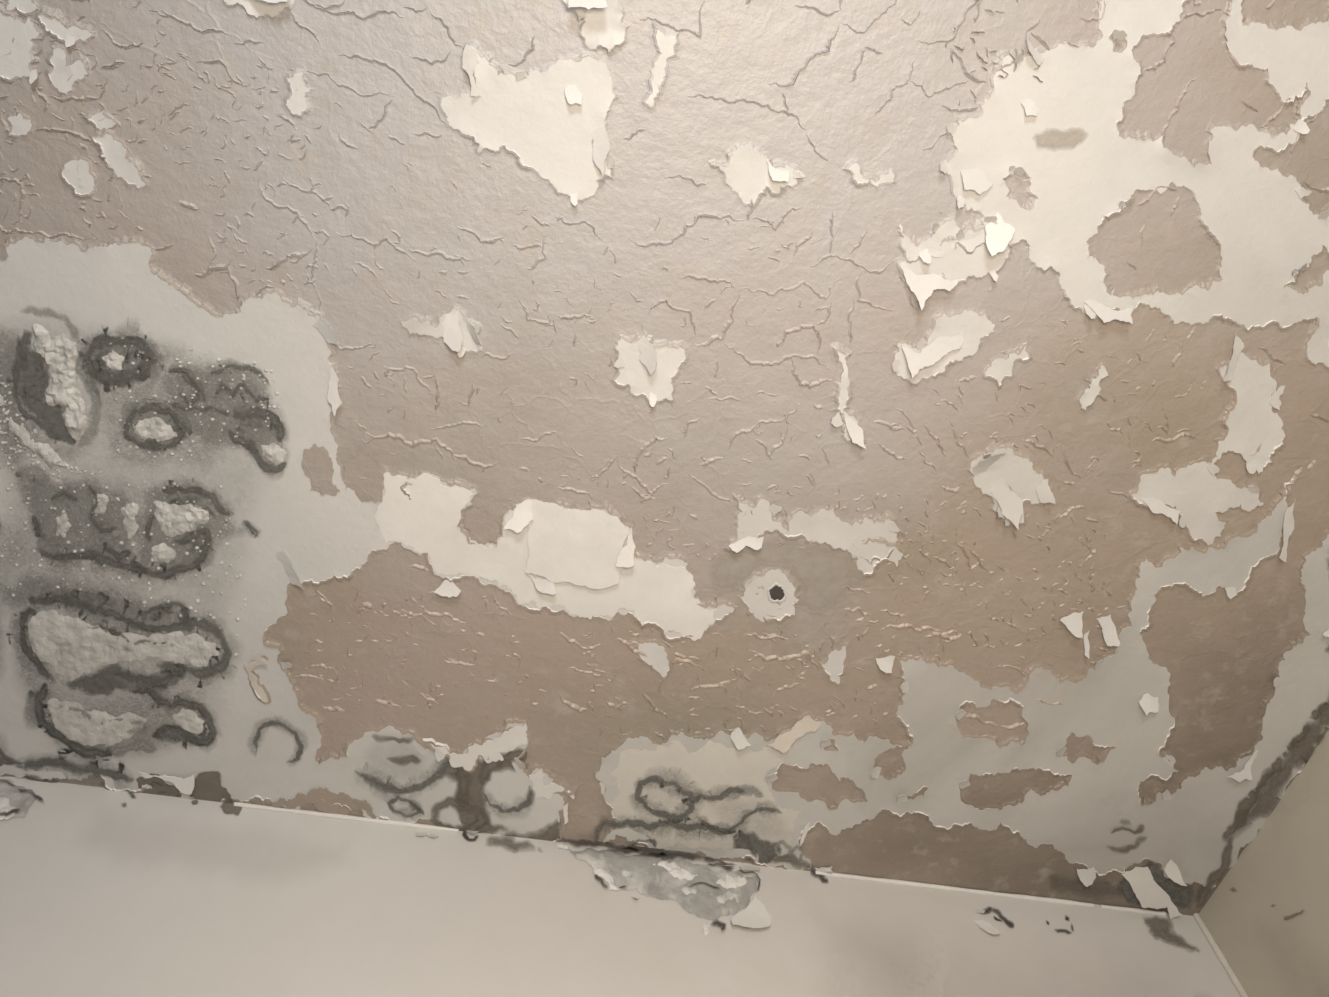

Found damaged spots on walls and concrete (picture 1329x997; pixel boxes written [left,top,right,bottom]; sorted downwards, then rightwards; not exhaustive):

peeling [0,0,98,98]
peeling [436,0,631,207]
peeling [894,0,1329,373]
water stain [0,308,230,579]
water stain [0,578,242,815]
water stain [361,749,560,850]
crack [0,0,1206,741]
peeling [0,233,1329,936]
water stain [595,776,811,868]
water stain [1145,703,1329,950]
crack [1257,346,1288,364]
crack [1288,459,1316,495]